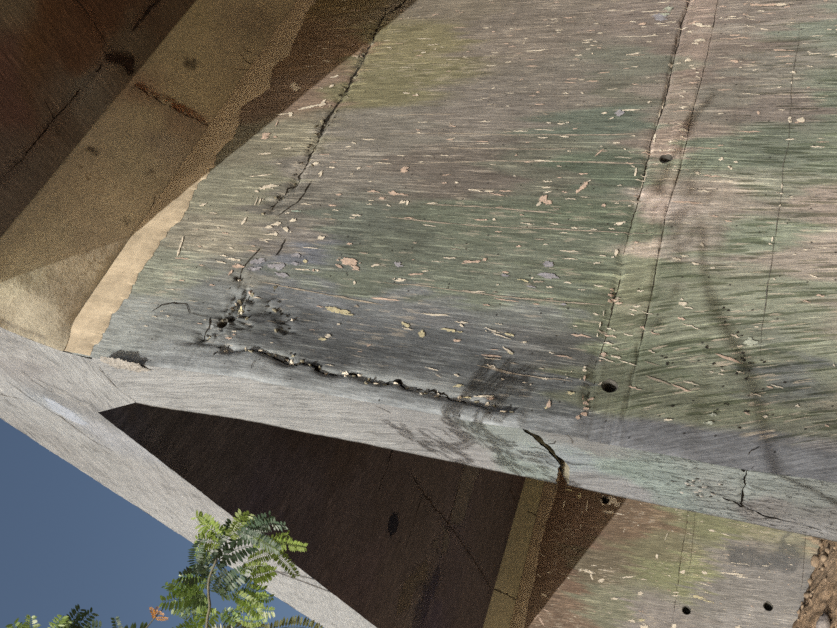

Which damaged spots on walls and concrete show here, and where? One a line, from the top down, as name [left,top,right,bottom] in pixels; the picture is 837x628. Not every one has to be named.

crack [131,0,160,32]
crack [1,64,102,179]
crack [136,87,208,125]
crack [270,0,405,217]
crack [251,350,512,413]
crack [524,429,574,484]
crack [722,446,822,589]